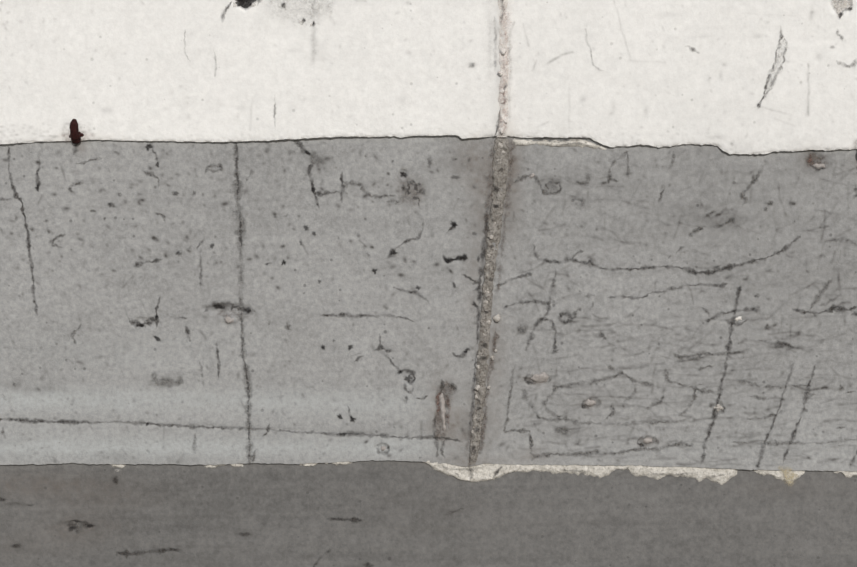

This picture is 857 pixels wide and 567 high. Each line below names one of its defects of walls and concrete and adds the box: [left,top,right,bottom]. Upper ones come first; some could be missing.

hole [222,0,256,16]
crack [297,142,387,205]
crack [11,169,40,310]
crack [626,246,787,350]
crack [0,417,83,425]
peeling [435,381,456,439]
crack [531,378,723,457]
crack [766,366,815,457]
peeling [423,450,737,485]
peeling [754,470,805,484]